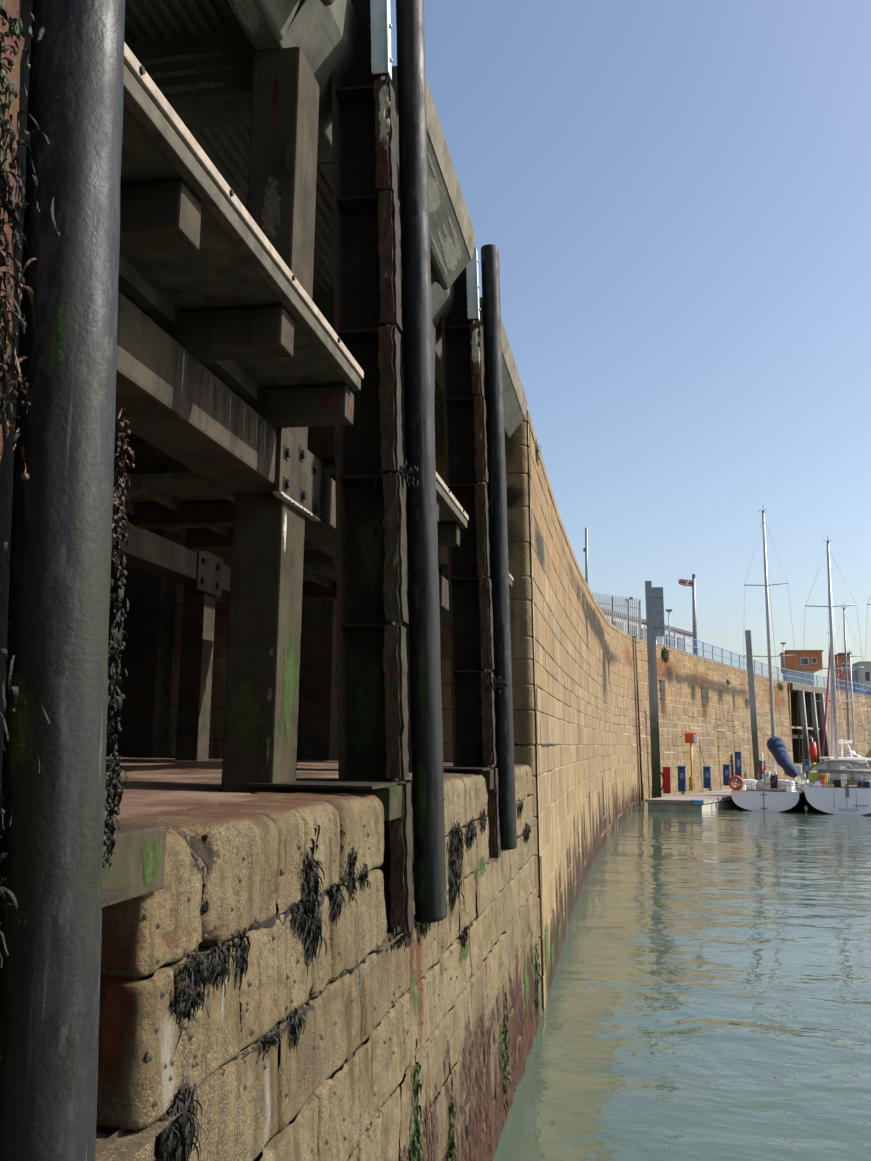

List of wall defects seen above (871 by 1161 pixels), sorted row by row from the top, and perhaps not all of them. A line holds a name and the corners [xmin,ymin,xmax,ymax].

leakage [577,585,616,688]
corrosion [409,932,423,1025]
leakage [411,777,643,1161]